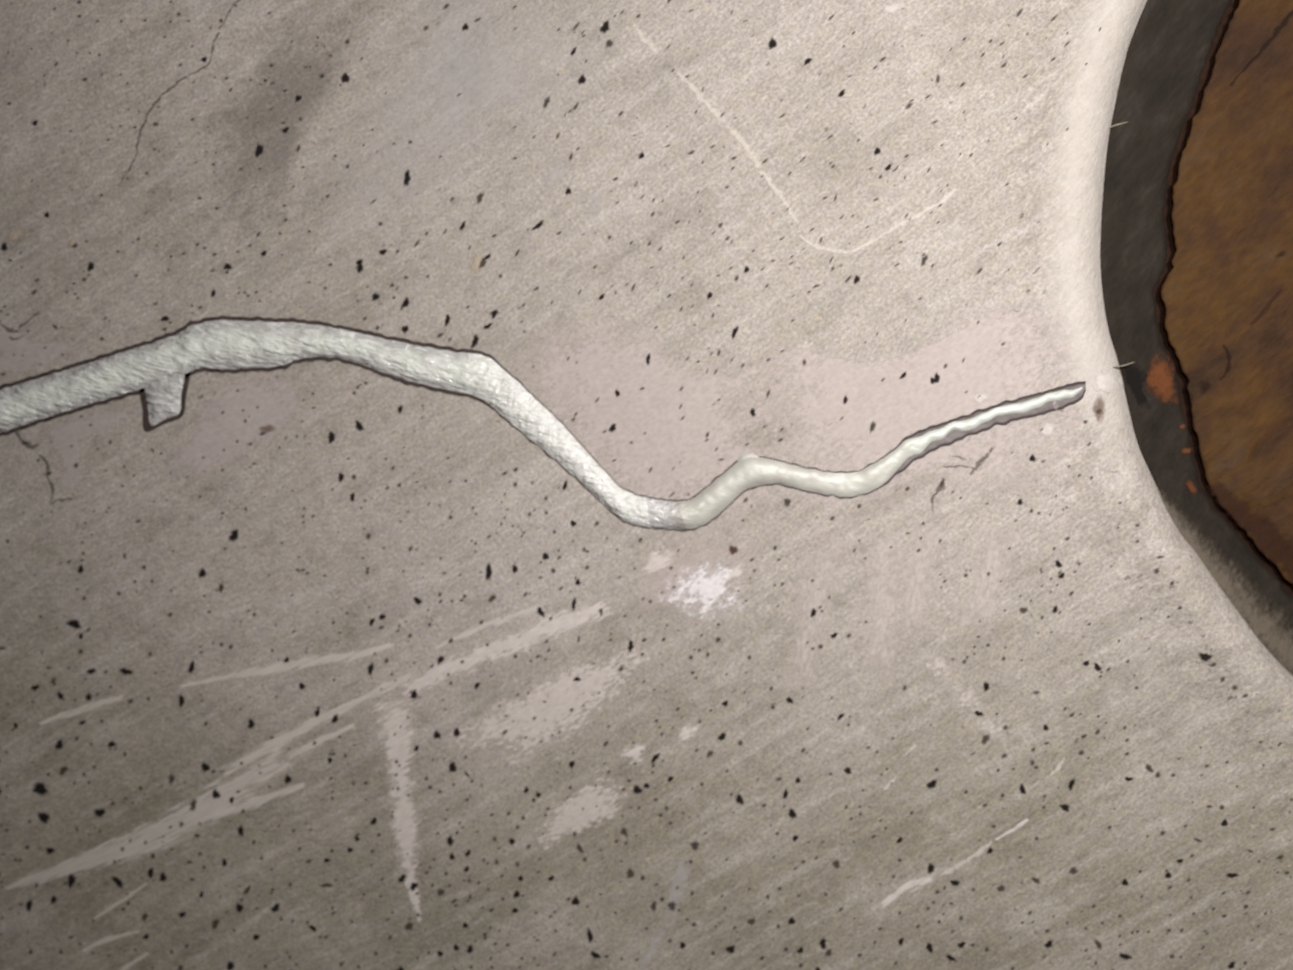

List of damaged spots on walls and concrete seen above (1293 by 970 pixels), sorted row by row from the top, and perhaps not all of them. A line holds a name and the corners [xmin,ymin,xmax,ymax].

crack [0,316,1086,532]